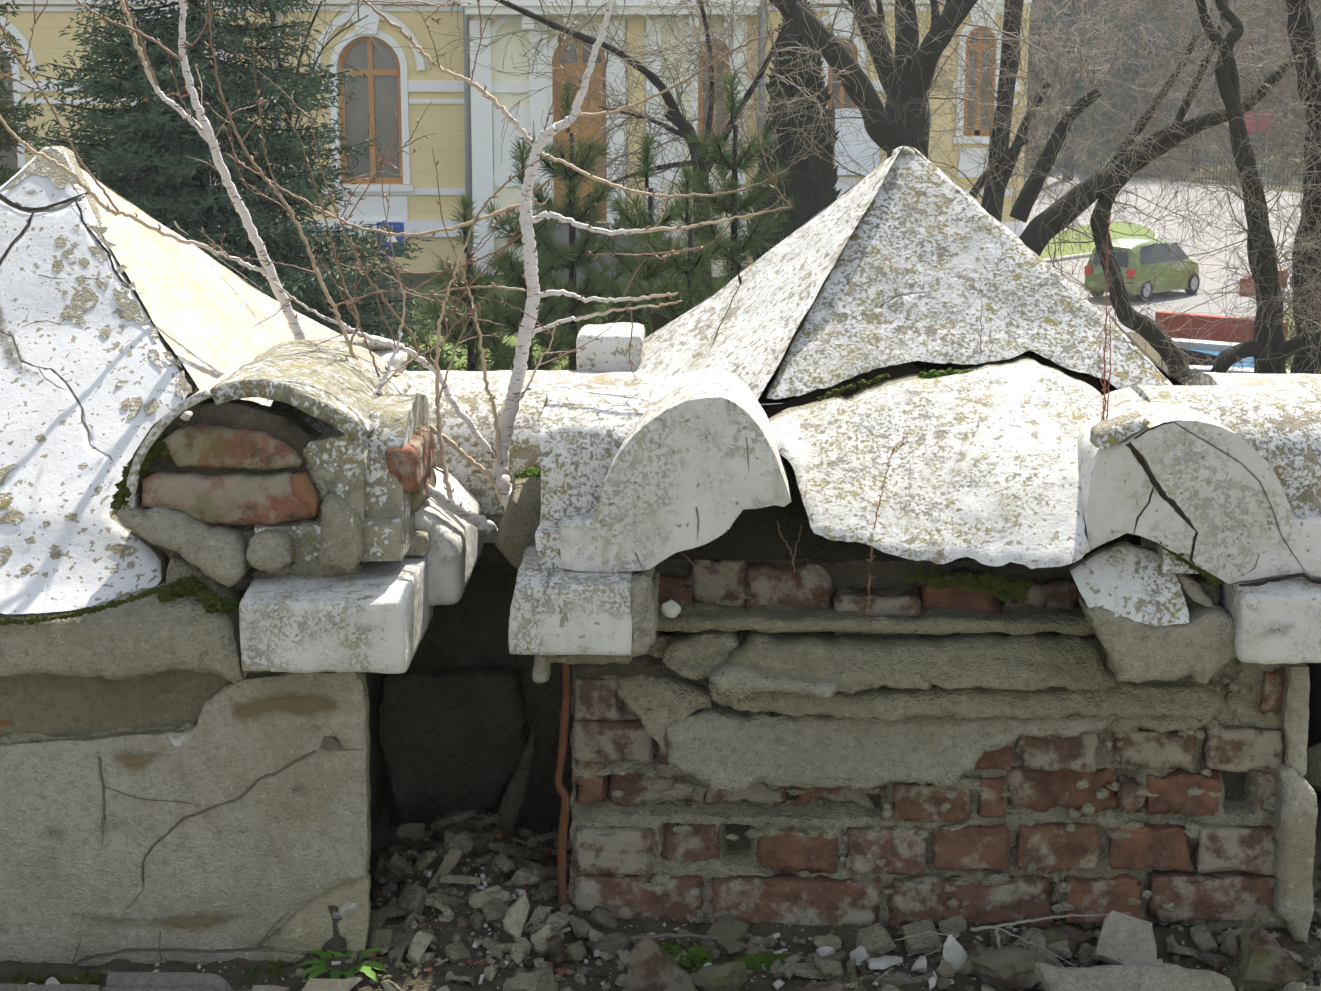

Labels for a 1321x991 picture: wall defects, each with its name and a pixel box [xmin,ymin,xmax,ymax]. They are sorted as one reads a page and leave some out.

crack [0,192,142,294]
crack [2,320,114,463]
spalling [24,224,367,591]
peeling [0,464,25,524]
spalling [385,426,437,513]
crack [1126,420,1321,587]
peeling [0,545,35,574]
spalling [647,599,681,658]
crack [98,749,361,911]
spalling [260,656,1285,986]
crack [73,915,304,965]
spalling [382,967,422,991]